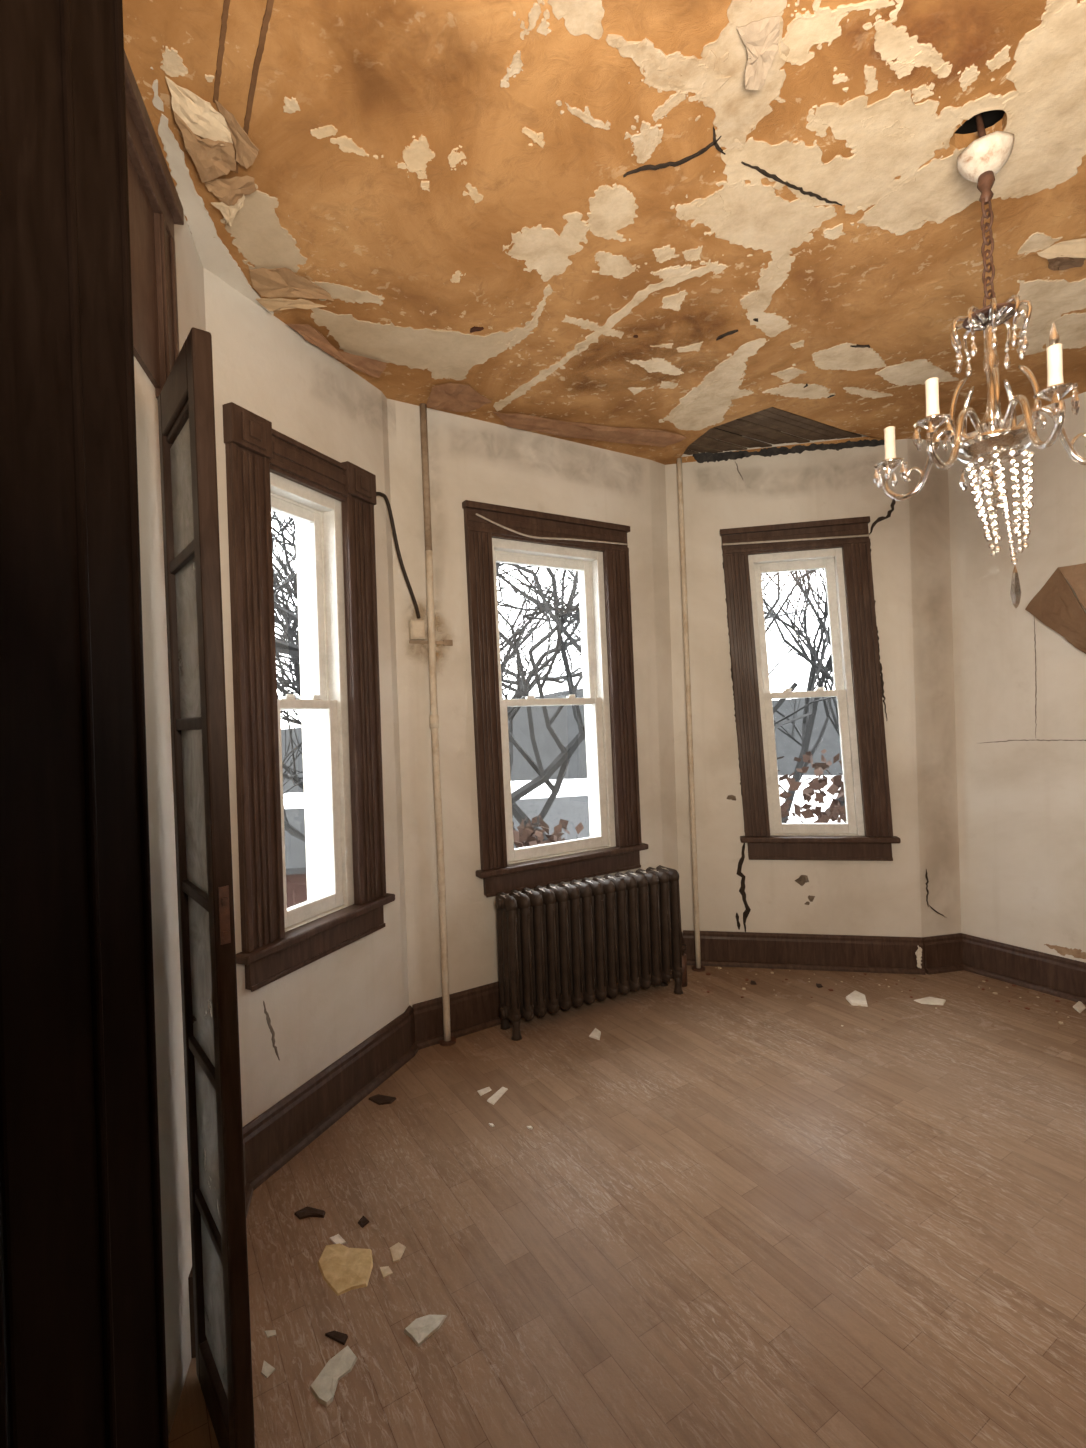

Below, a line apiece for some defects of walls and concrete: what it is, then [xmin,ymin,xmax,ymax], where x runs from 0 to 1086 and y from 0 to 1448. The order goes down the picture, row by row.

peeling [283,96,300,113]
flaking render [150,45,274,316]
peeling [310,124,467,192]
peeling [463,183,484,203]
crack [623,126,842,206]
flaking render [493,0,1086,463]
peeling [311,281,385,306]
peeling [450,270,466,283]
crack [984,618,1086,743]
crack [721,542,751,932]